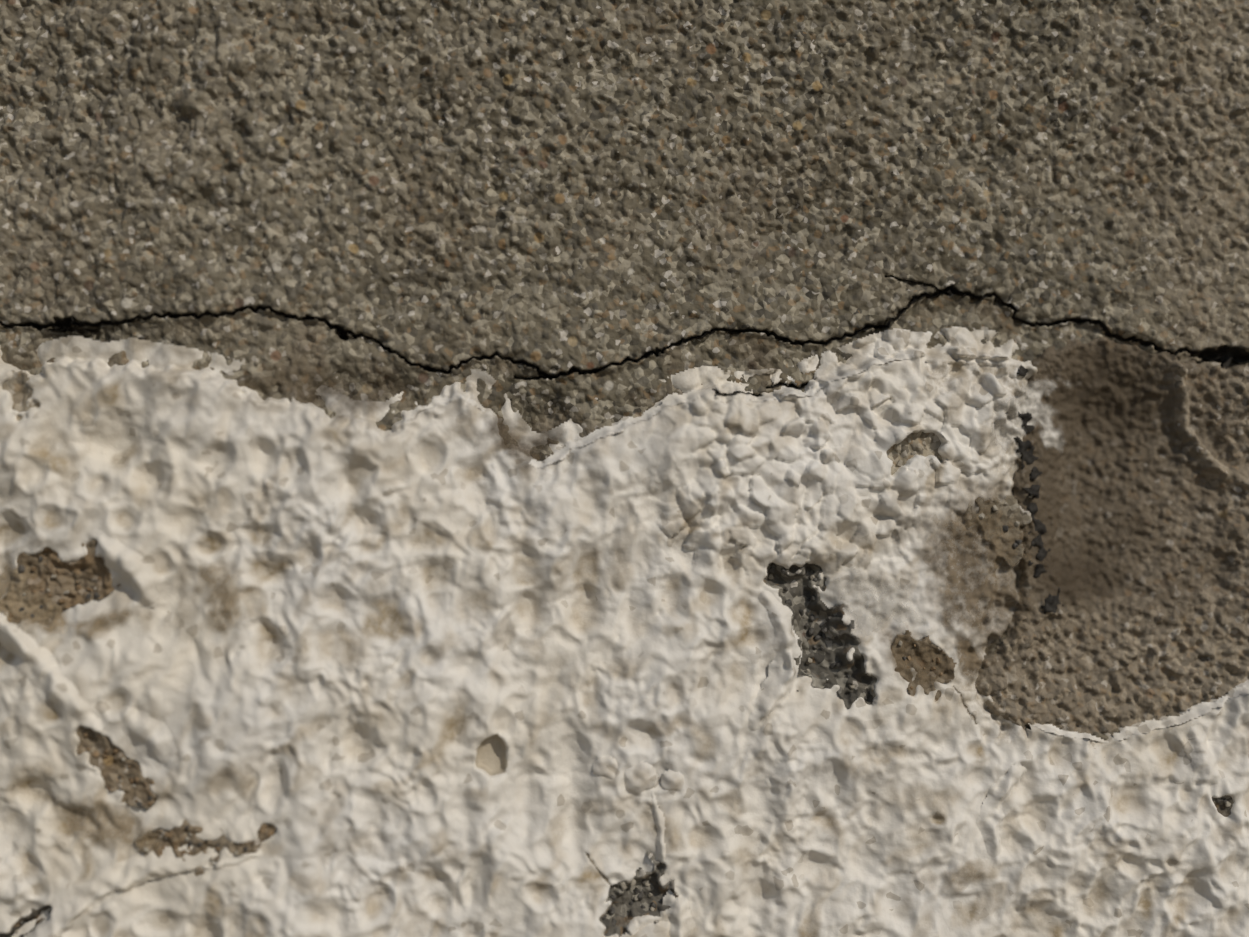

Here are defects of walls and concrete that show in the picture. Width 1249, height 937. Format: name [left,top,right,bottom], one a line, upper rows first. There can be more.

crack [0,275,1249,379]
peeling [528,353,928,468]
crack [713,382,808,396]
spalling [886,431,942,475]
spalling [966,335,1249,743]
spalling [5,539,121,626]
spalling [763,563,877,709]
spalling [892,630,957,702]
spalling [76,726,156,810]
spalling [135,820,276,877]
hole [0,905,52,937]
hole [599,851,679,937]